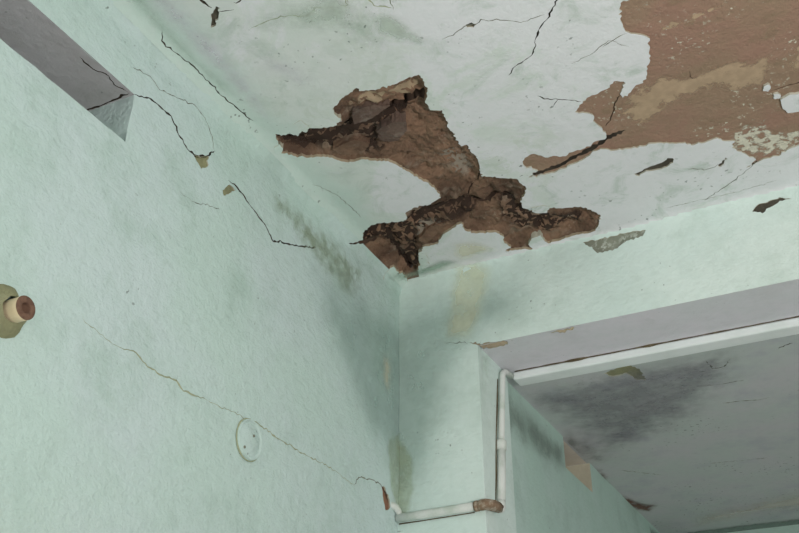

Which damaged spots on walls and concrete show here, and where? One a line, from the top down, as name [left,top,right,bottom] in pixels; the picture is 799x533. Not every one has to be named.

crack [250,0,348,29]
crack [444,0,557,75]
crack [80,57,214,158]
peeling [523,0,799,177]
crack [228,180,316,249]
flaking render [274,75,645,281]
flaking render [752,197,789,213]
crack [83,319,389,503]